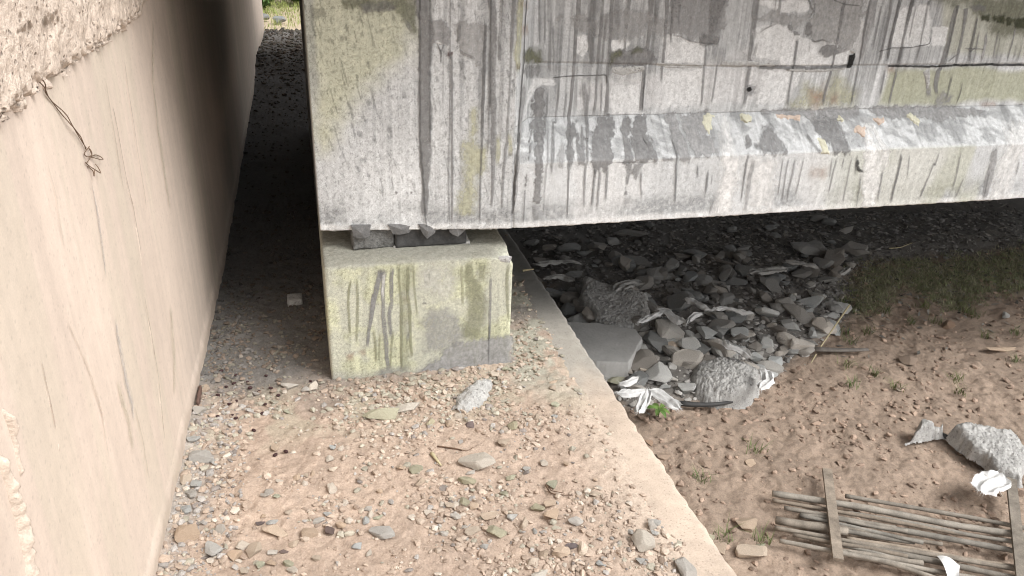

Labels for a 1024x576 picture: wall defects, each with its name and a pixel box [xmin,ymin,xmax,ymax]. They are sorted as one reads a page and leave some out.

water stain [523,0,1024,220]
crack [760,63,846,71]
crack [881,39,1024,68]
water stain [347,265,514,374]